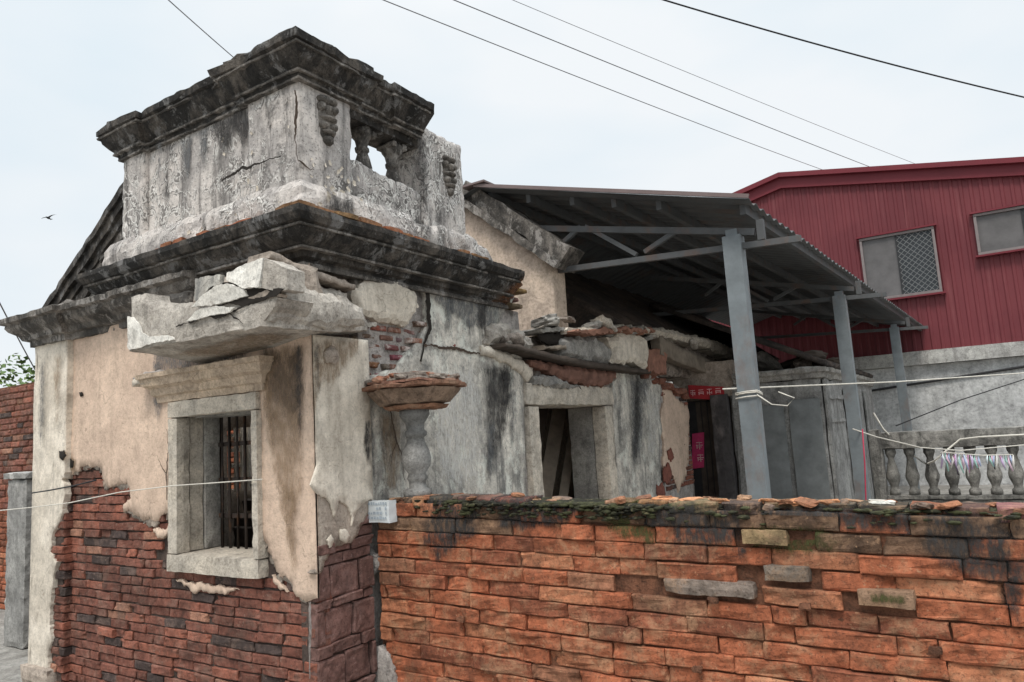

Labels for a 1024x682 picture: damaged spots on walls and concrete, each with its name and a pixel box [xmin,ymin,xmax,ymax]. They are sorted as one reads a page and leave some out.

leakage [182,109,249,175]
crack [222,90,314,181]
spalling [127,258,305,350]
crack [420,292,480,362]
leakage [153,334,302,556]
flaking render [309,317,427,548]
leakage [437,365,516,484]
leakage [619,377,659,462]
flaking render [640,374,695,496]
flaking render [59,450,333,682]